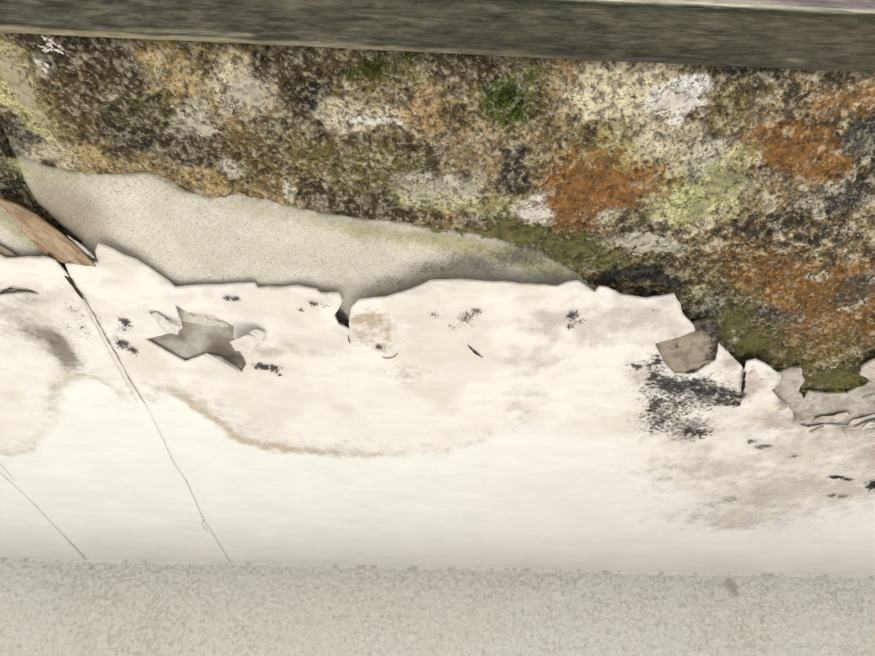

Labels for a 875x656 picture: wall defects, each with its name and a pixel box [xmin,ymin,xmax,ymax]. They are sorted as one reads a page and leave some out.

crack [0,140,49,220]
spalling [0,32,875,435]
damp [23,301,102,367]
damp [112,318,139,357]
crack [47,254,231,563]
damp [231,351,283,376]
damp [297,302,389,332]
damp [428,307,486,330]
damp [539,310,594,330]
damp [629,326,759,441]
crack [0,464,86,560]
damp [693,471,875,528]